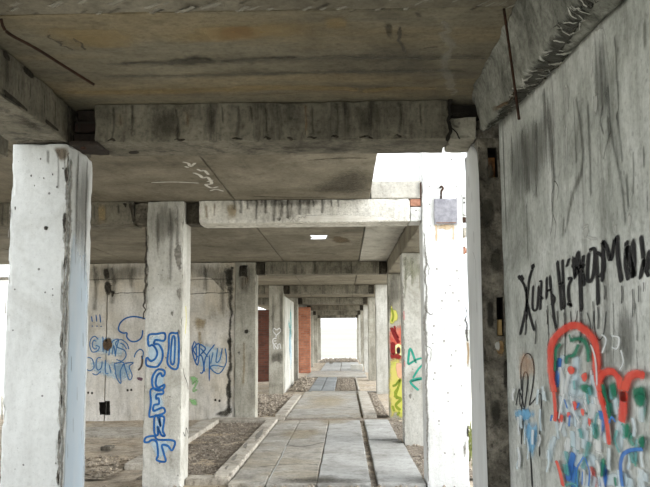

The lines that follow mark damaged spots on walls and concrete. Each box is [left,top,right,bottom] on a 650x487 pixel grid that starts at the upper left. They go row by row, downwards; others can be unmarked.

crack [446,99,470,141]
damp [492,0,598,124]